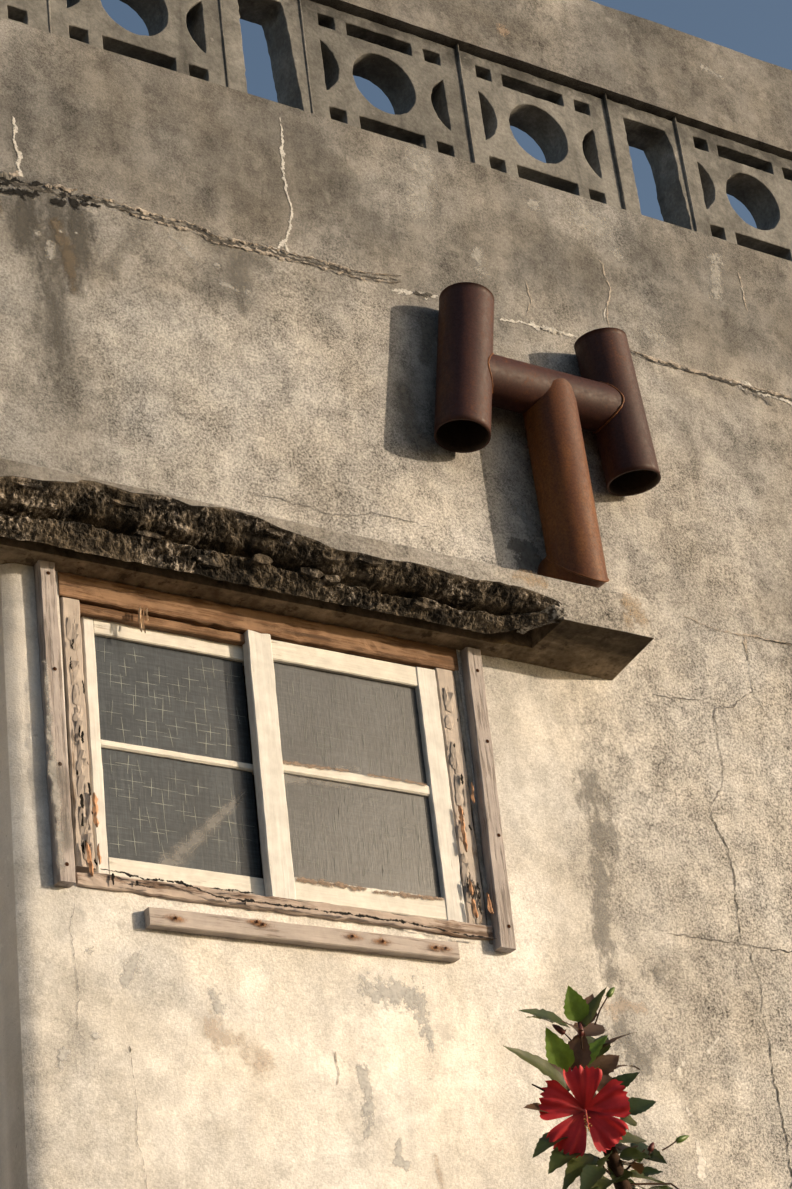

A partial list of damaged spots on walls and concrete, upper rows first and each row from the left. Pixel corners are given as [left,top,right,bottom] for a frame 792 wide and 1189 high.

crack [0,117,438,300]
crack [500,280,578,337]
crack [599,260,612,327]
crack [630,350,792,407]
spalling [0,476,568,634]
crack [651,615,792,1189]